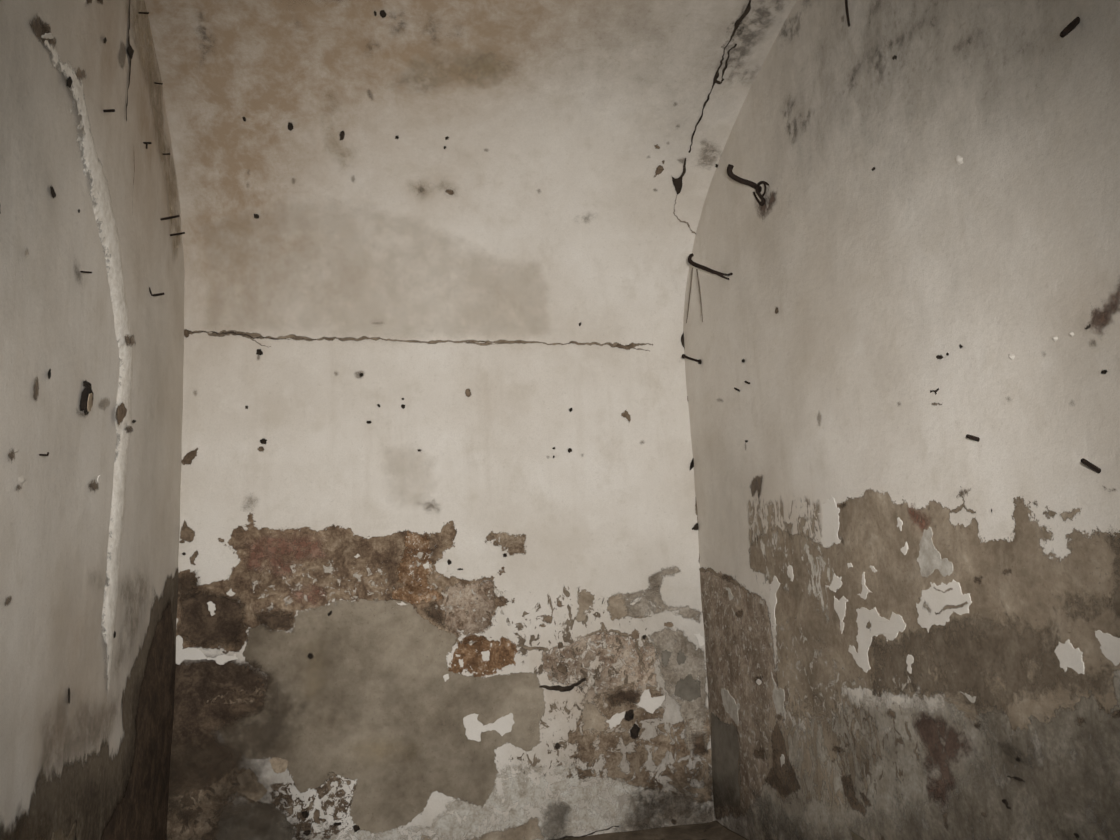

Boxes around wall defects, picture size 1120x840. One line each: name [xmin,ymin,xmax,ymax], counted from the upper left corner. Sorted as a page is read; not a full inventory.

crack [672,0,751,234]
crack [184,329,653,351]
leakage [0,569,288,840]
flaking render [167,476,1120,840]
leakage [302,669,1120,840]